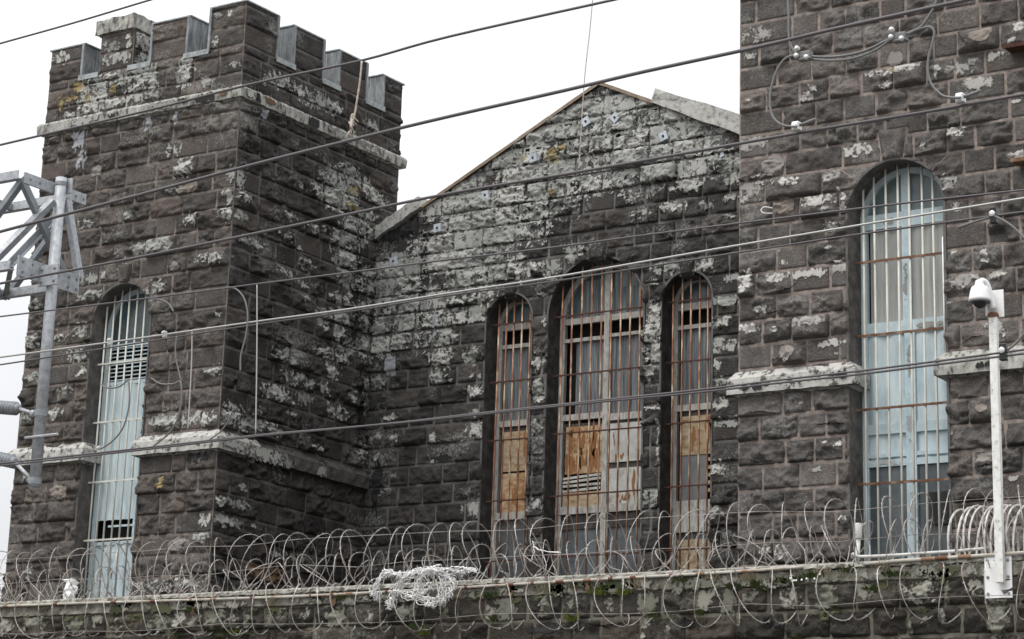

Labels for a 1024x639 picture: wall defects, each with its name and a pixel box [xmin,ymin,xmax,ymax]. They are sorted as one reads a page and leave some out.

spalling [177,182,198,194]